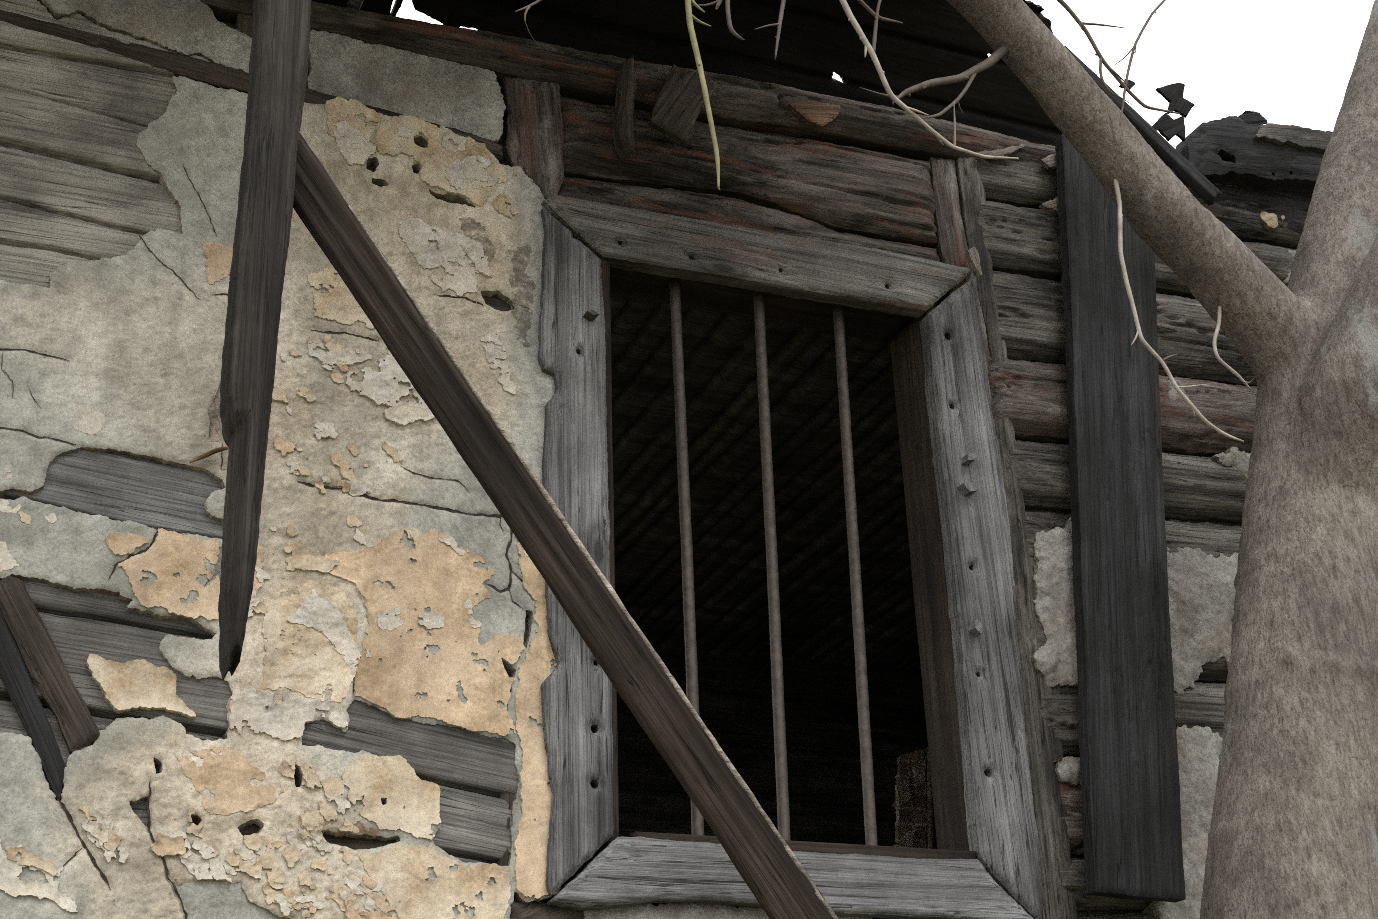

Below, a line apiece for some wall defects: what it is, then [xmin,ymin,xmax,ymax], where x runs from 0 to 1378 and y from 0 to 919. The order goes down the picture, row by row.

flaking render [0,0,210,288]
crack [182,164,217,237]
peeling [325,97,518,219]
crack [136,231,228,300]
peeling [201,241,233,285]
peeling [398,218,515,311]
peeling [280,268,435,426]
crack [0,348,82,446]
peeling [272,387,317,415]
peeling [0,408,557,919]